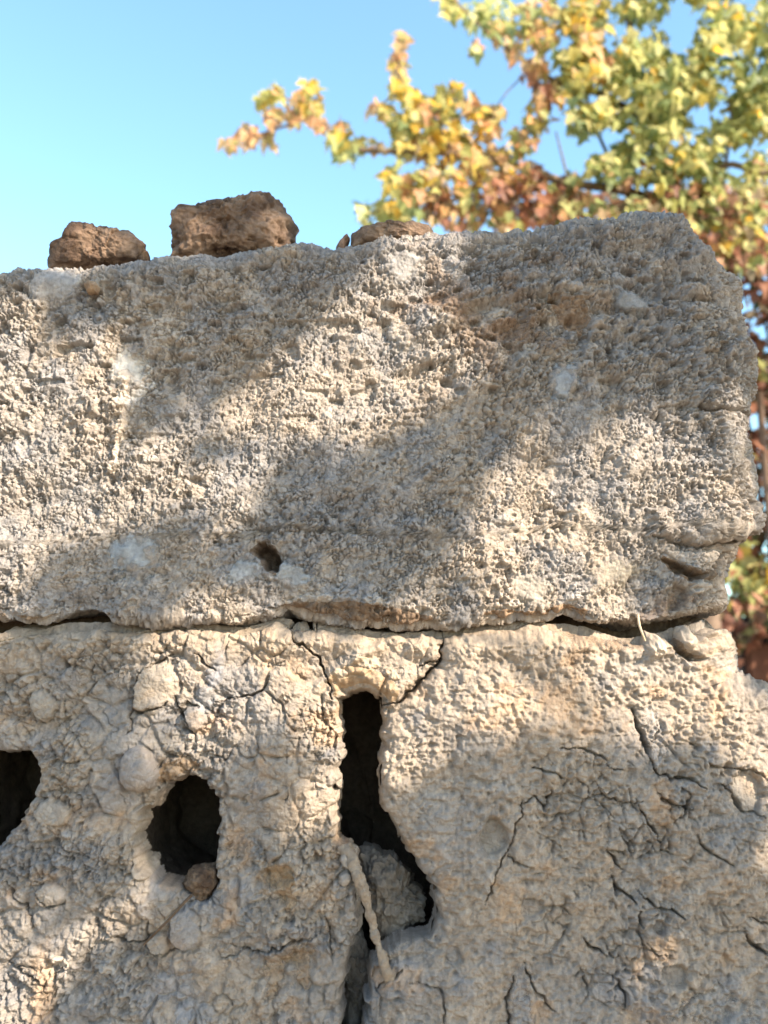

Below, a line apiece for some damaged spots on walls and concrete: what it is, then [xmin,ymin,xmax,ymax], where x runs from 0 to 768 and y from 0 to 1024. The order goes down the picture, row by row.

crack [0,615,134,646]
crack [127,652,270,735]
crack [285,619,331,699]
crack [382,638,445,709]
crack [545,614,691,638]
crack [485,708,768,905]
crack [581,835,683,1011]
crack [742,917,768,957]
crack [504,965,556,1024]